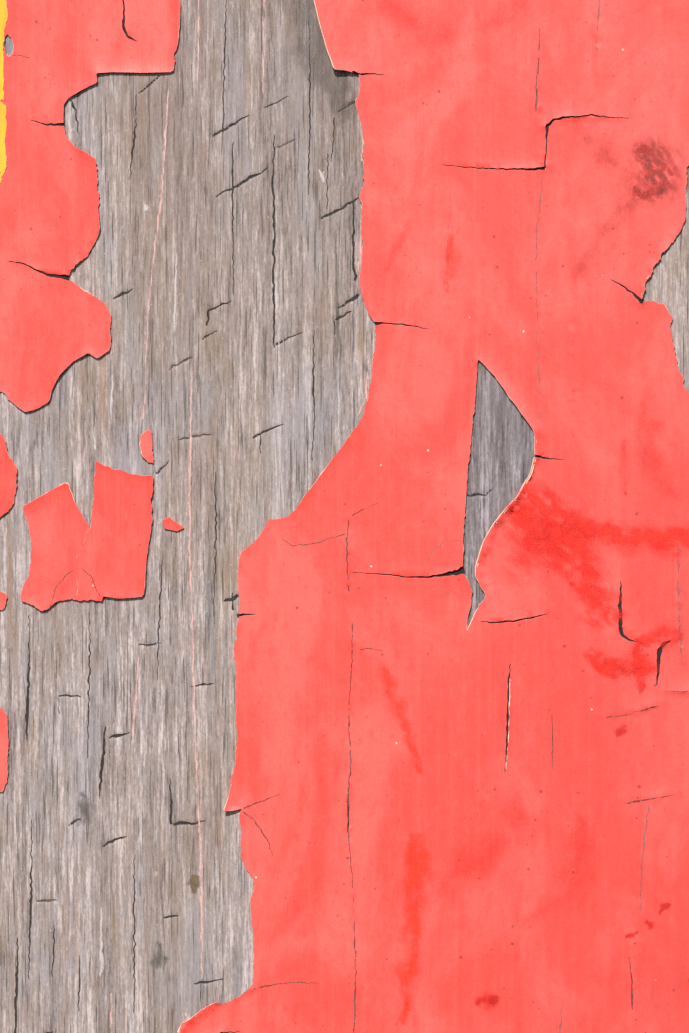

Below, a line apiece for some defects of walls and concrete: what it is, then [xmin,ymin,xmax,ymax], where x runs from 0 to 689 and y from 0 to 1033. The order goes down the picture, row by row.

crack [122,0,136,41]
peeling [0,0,181,412]
crack [443,28,629,416]
crack [25,568,130,799]
peeling [0,430,184,611]
crack [347,622,382,1033]
crack [282,503,465,595]
peeling [177,0,689,1033]
crack [504,664,512,773]
crack [606,547,682,718]